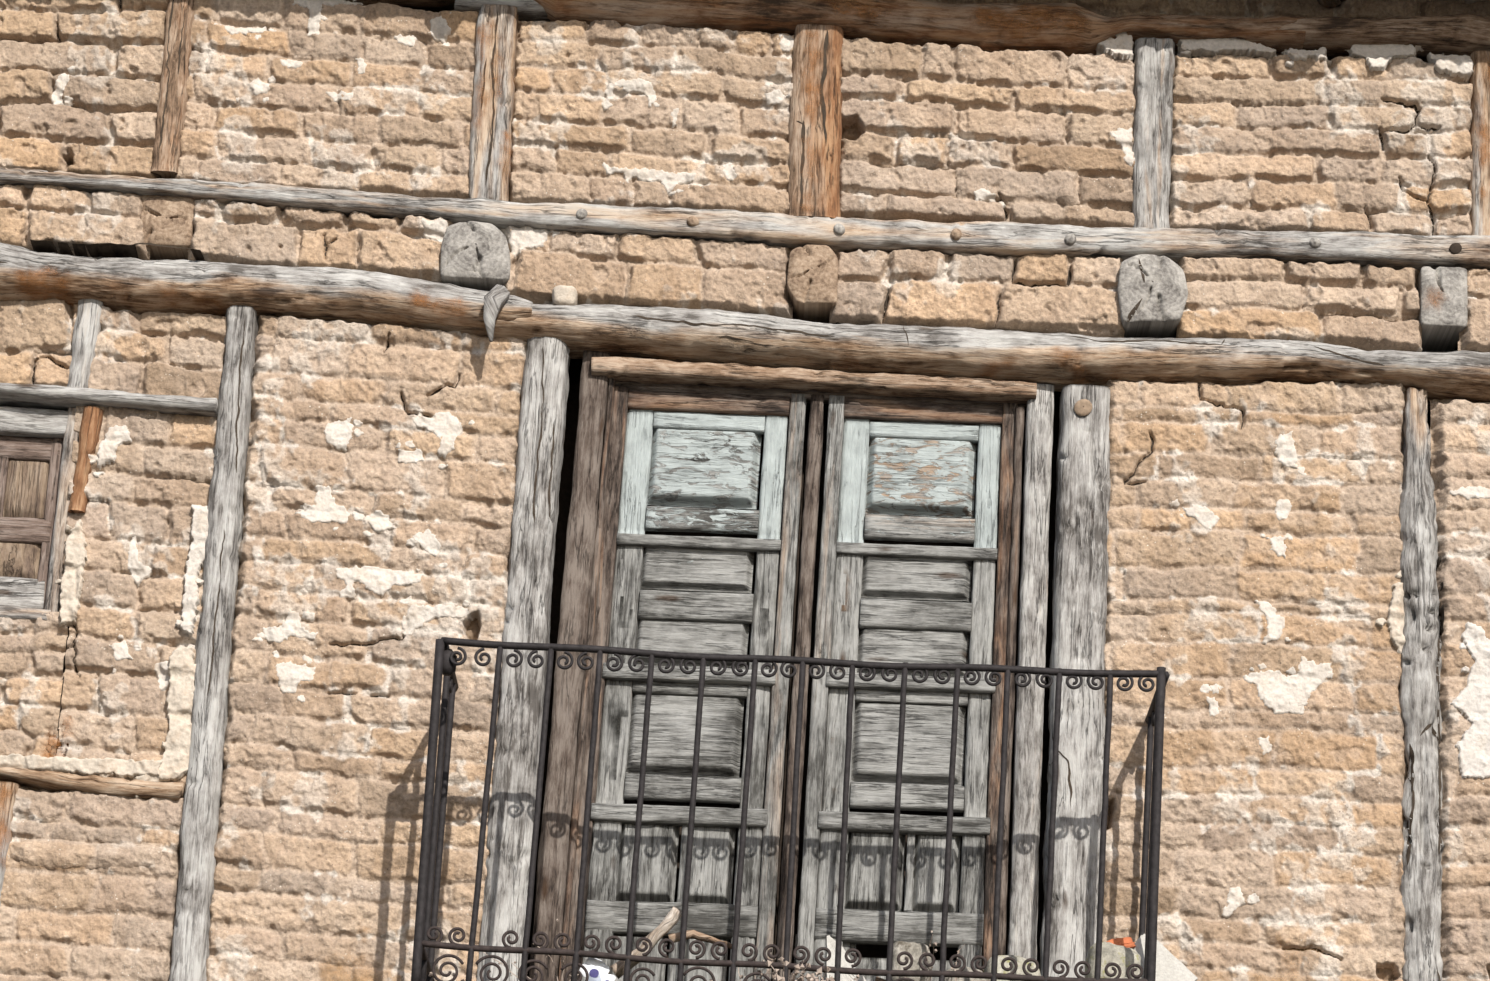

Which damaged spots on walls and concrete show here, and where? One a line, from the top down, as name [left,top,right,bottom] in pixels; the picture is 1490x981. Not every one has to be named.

crack [1379,101,1437,236]
crack [1198,385,1244,431]
crack [1124,436,1154,486]
flaking render [1254,600,1292,645]
flaking render [1200,684,1224,716]
flaking render [1243,656,1333,715]
flaking render [1450,622,1490,779]
flaking render [1258,735,1273,755]